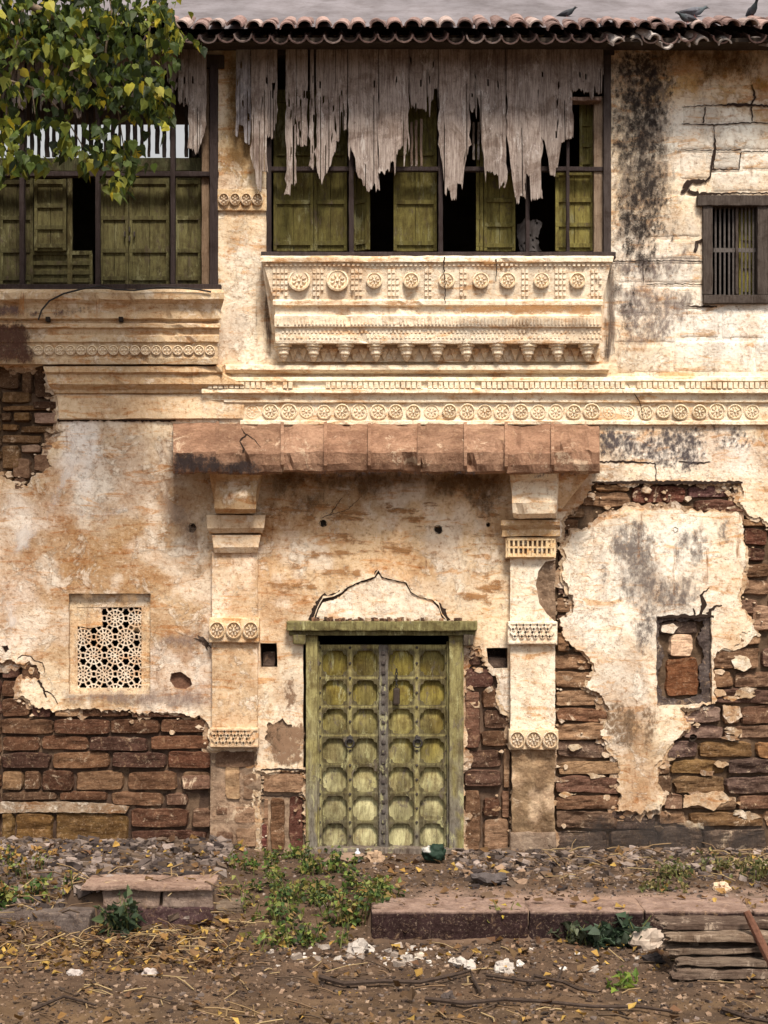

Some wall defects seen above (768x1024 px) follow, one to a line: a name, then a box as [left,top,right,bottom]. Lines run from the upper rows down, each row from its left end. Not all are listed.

water stain [605,50,767,357]
crack [680,84,768,195]
flaking render [0,366,63,490]
crack [239,428,261,453]
water stain [600,427,705,472]
water stain [610,521,695,652]
water stain [676,531,705,566]
flaking render [536,480,768,850]
flaking render [0,645,306,853]
flaking render [463,645,512,850]